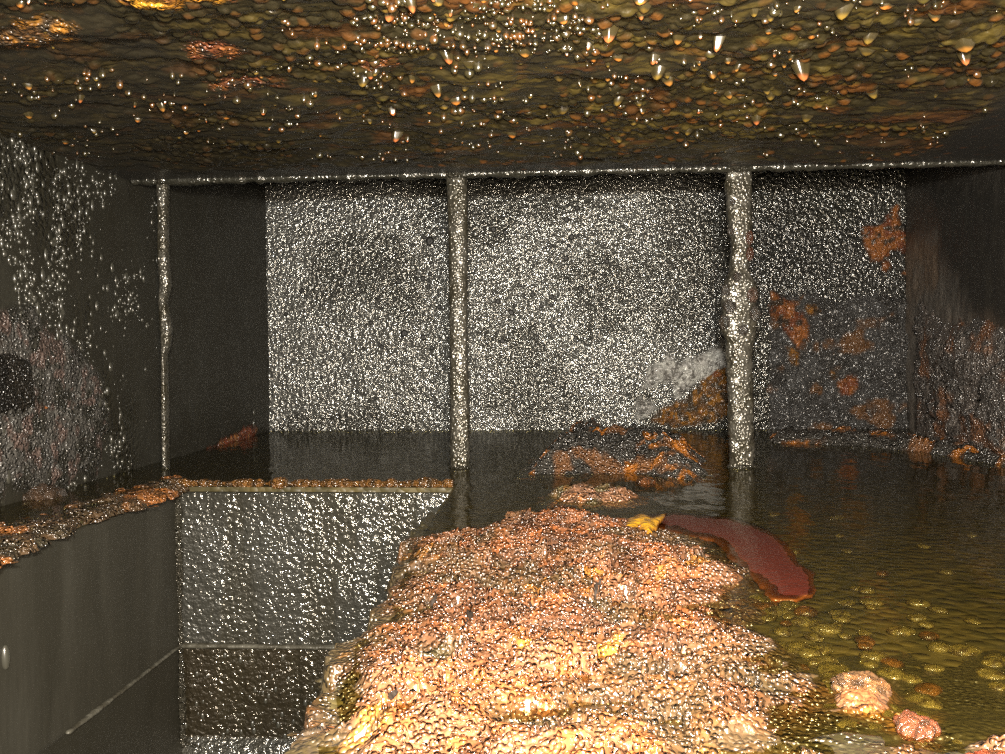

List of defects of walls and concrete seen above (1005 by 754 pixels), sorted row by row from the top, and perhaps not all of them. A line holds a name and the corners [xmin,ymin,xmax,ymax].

rust [0,16,75,48]
rust [189,42,243,60]
rust [208,76,282,89]
rust [861,205,906,271]
rust [771,292,818,365]
rust [830,372,859,396]
rust [514,368,728,511]
rust [0,475,454,568]